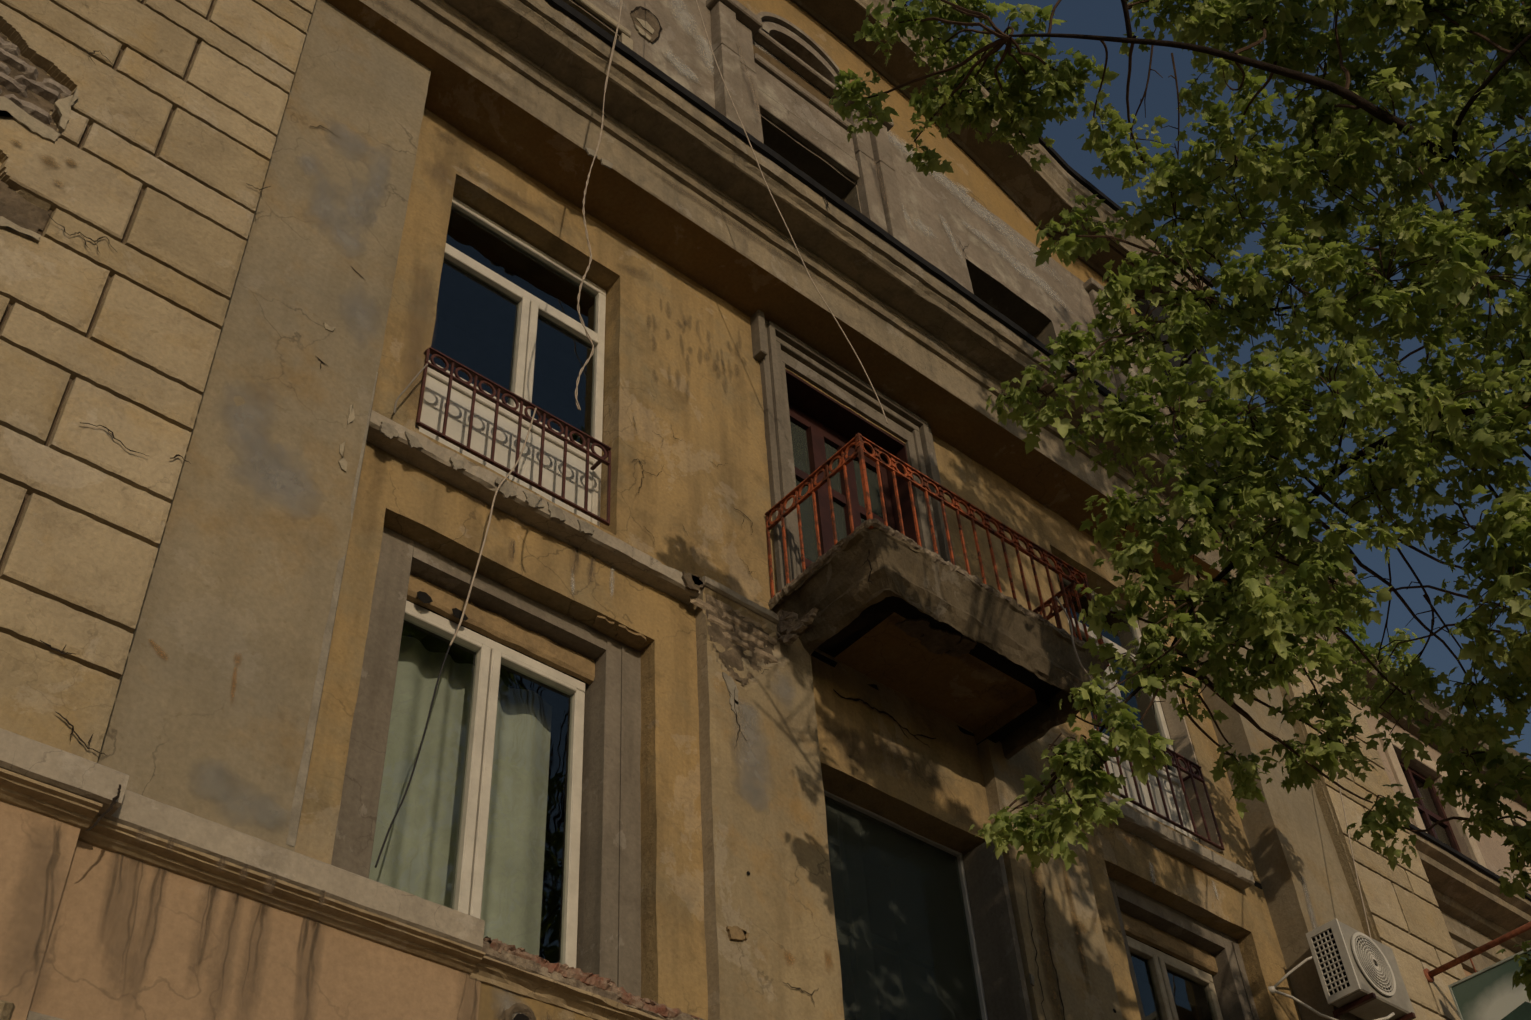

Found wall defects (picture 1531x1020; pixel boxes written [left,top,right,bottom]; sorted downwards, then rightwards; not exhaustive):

spalling [0,30,79,143]
spalling [0,179,51,243]
spalling [681,571,819,716]
crack [55,711,121,831]
crack [833,689,936,748]
spalling [483,936,699,1020]